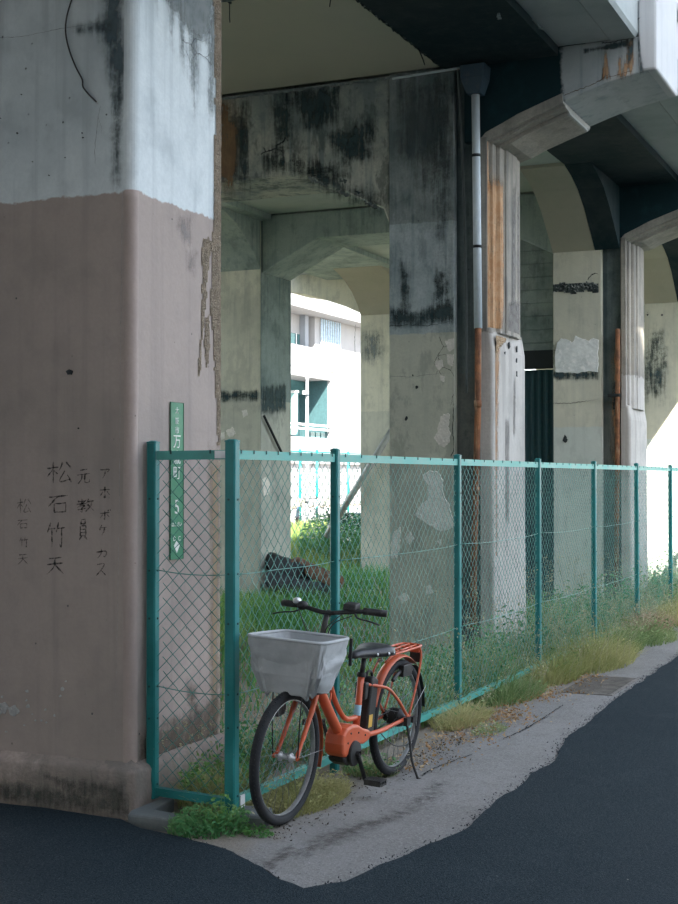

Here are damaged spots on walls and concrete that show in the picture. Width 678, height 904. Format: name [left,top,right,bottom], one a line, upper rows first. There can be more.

leakage [168,0,216,110]
leakage [238,102,251,188]
leakage [263,86,375,204]
spalling [198,0,236,445]
corrosion [487,143,504,329]
leakage [390,262,453,327]
leakage [221,384,286,414]
peeling [434,413,451,448]
peeling [435,338,454,382]
peeling [555,336,599,374]
mould [645,337,666,397]